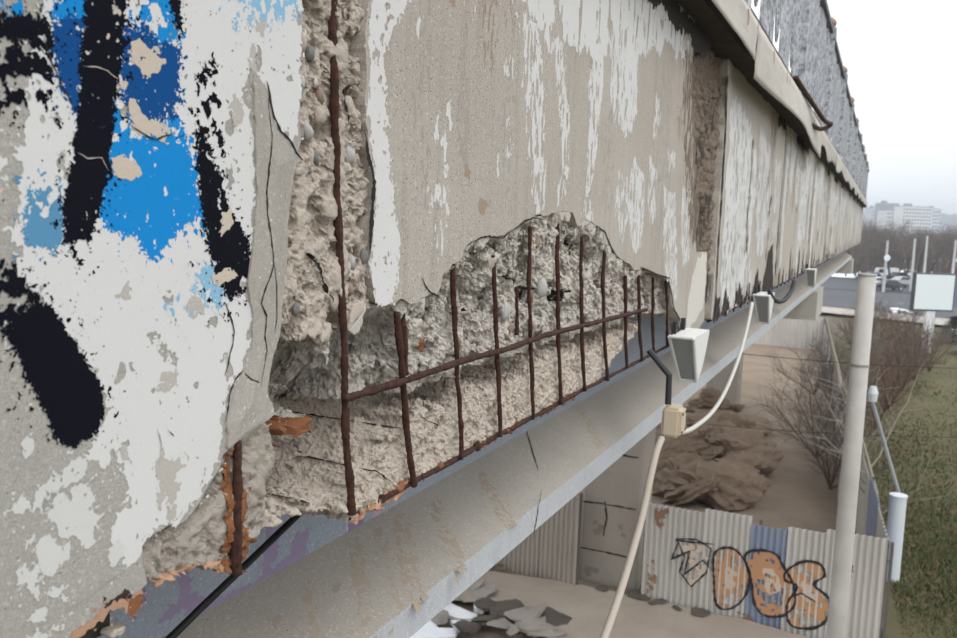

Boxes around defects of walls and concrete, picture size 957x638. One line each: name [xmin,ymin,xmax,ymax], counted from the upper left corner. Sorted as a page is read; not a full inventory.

crack [224,82,303,419]
spalling [0,0,723,638]
peeling [704,95,863,324]
rust [61,448,257,638]
rust [265,412,312,448]
rust [347,462,444,531]
rust [458,389,576,457]